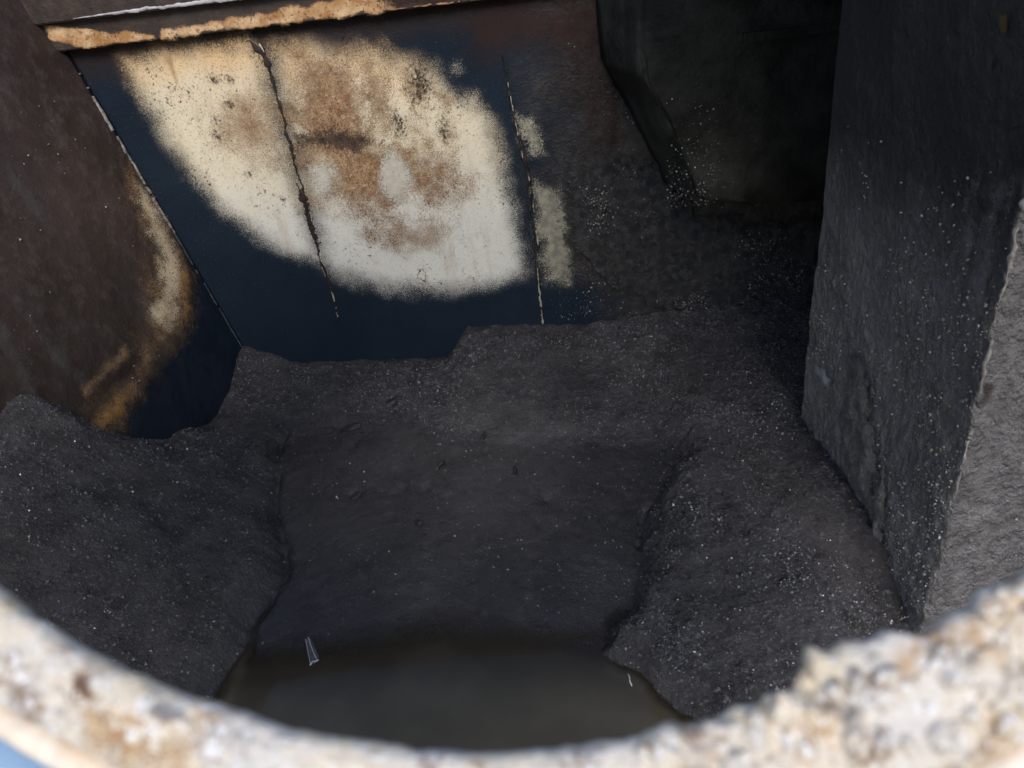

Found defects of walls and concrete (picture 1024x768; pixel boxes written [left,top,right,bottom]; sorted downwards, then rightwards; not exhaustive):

rust [84,164,195,434]
damp [120,218,243,440]
peeling [43,0,526,294]
crack [250,40,339,325]
damp [291,122,373,154]
rust [215,36,483,249]
crack [501,55,544,324]